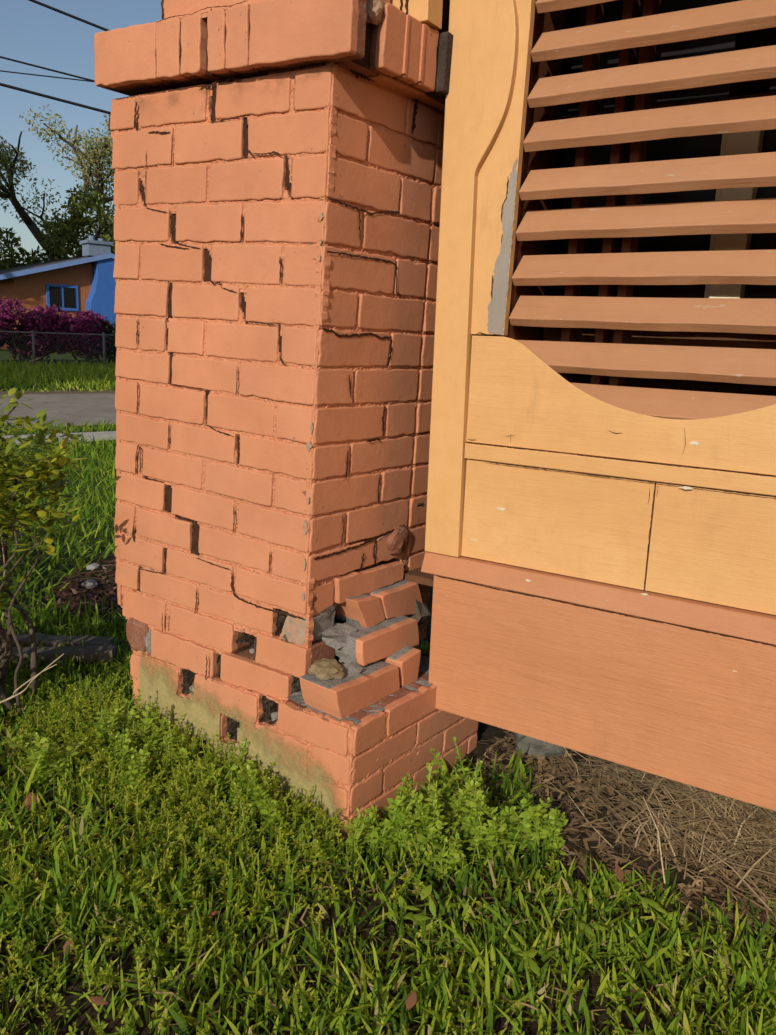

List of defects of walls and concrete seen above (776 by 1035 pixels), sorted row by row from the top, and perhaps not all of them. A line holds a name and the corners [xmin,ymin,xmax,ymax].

crack [155,0,294,199]
crack [139,171,286,365]
crack [327,197,402,296]
peeling [477,159,518,335]
crack [167,283,240,463]
crack [135,445,304,620]
crack [314,514,405,572]
peeling [181,669,197,695]
peeling [226,717,240,740]
peeling [235,631,257,659]
peeling [261,695,278,724]
peeling [275,609,289,636]